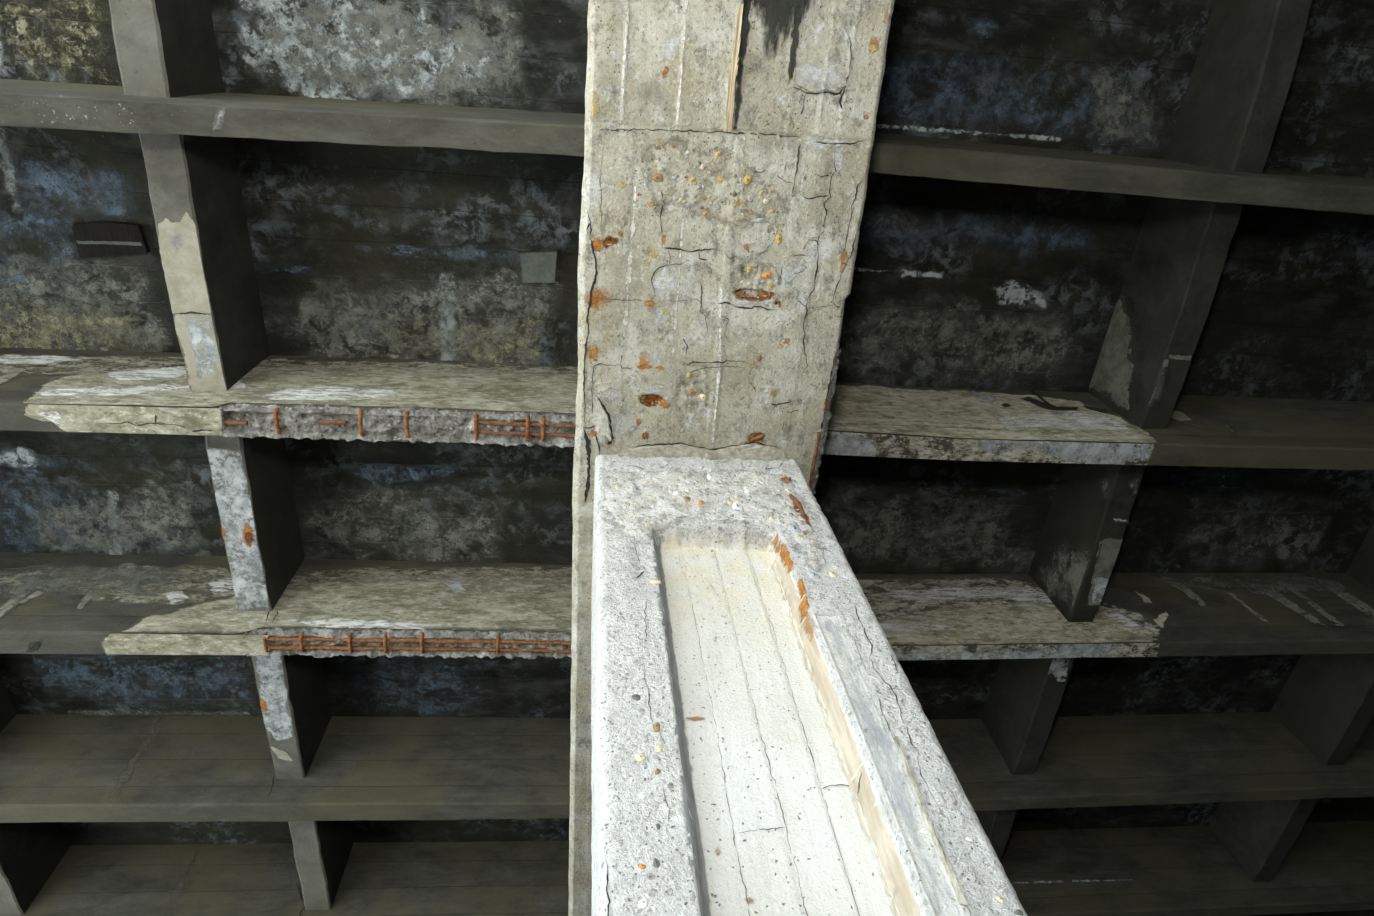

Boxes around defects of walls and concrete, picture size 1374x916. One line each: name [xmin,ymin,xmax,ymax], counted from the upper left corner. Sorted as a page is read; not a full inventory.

efflorescence [240,0,523,105]
water stain [733,0,815,129]
corrosion [593,231,623,251]
crack [583,32,862,502]
corrosion [586,291,610,307]
spalling [735,290,775,301]
corrosion [637,355,663,370]
spalling [219,403,576,448]
spalling [593,349,841,580]
corrosion [772,534,813,635]
spalling [243,627,572,659]